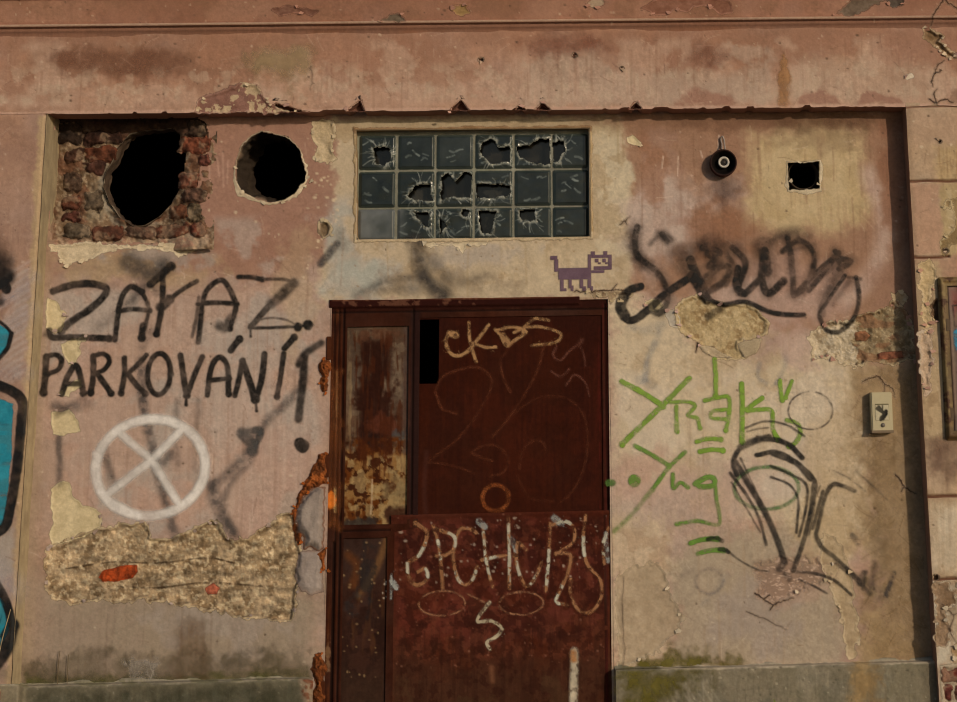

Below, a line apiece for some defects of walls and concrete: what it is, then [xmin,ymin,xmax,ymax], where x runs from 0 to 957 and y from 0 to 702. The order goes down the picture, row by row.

peeling [833,0,905,17]
spalling [922,26,957,60]
spalling [343,100,365,112]
crack [929,62,951,104]
flaking render [47,82,337,268]
spalling [940,197,957,256]
spalling [586,289,633,302]
spalling [643,292,770,361]
spalling [807,258,939,397]
spalling [43,481,302,623]
spalling [931,574,957,702]